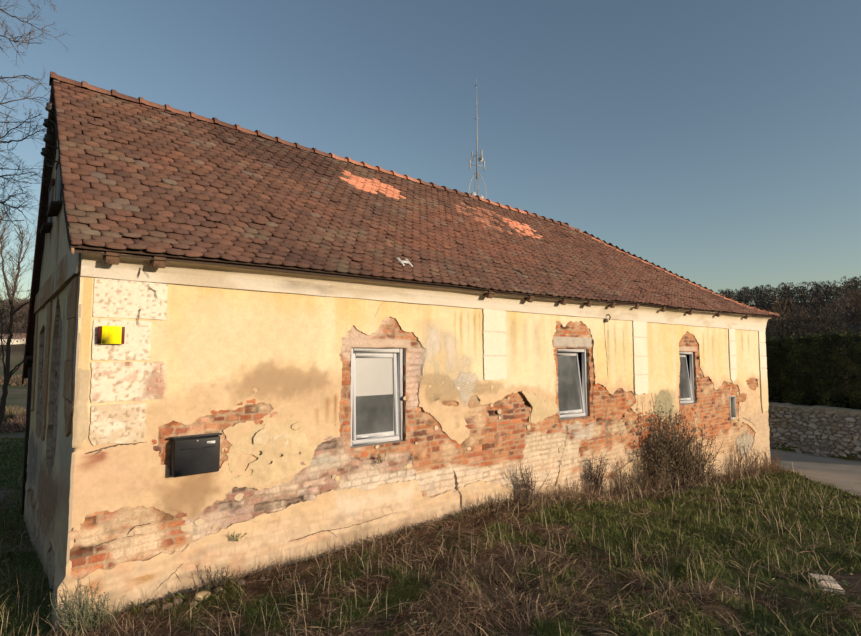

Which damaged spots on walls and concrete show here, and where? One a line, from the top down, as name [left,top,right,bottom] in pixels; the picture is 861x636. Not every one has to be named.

spalling [68,317,758,579]